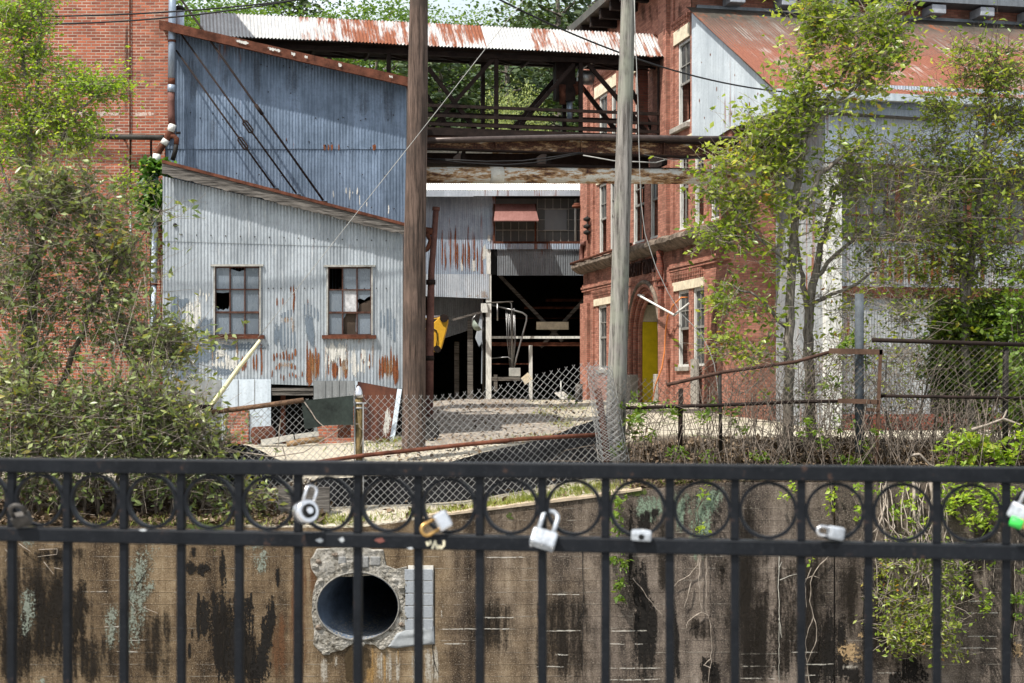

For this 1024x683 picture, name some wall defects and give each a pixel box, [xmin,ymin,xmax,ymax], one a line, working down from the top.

corrosion [441,225,483,271]
corrosion [234,339,348,386]
corrosion [361,349,399,385]
leakage [629,505,665,538]
leakage [0,548,119,682]
leakage [140,613,170,680]
leakage [186,547,280,683]
spalling [310,537,407,655]
leakage [469,599,513,649]
leakage [535,595,590,679]
leakage [628,554,666,682]
leakage [674,556,929,683]